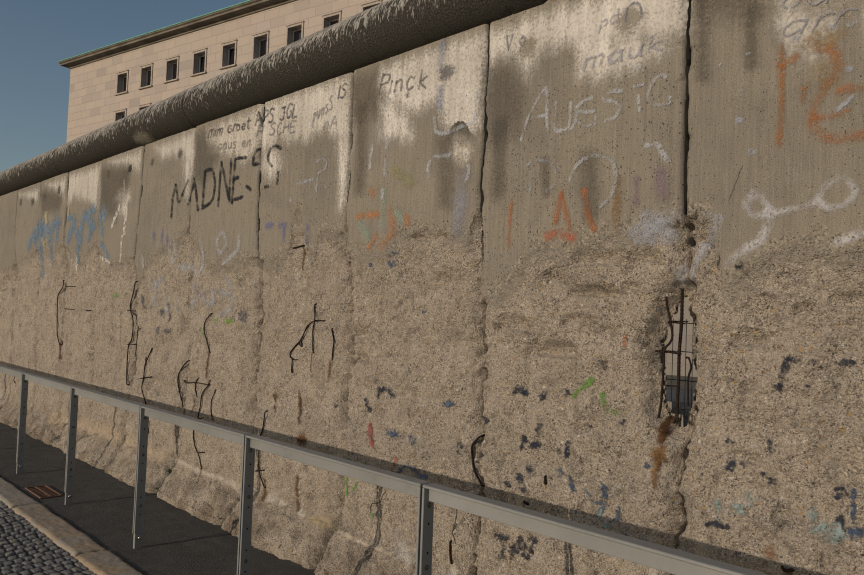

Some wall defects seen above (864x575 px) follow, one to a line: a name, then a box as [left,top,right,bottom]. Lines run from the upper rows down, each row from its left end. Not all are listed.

peeling [112,179,131,225]
spalling [0,208,864,575]
corrosion [652,415,676,487]